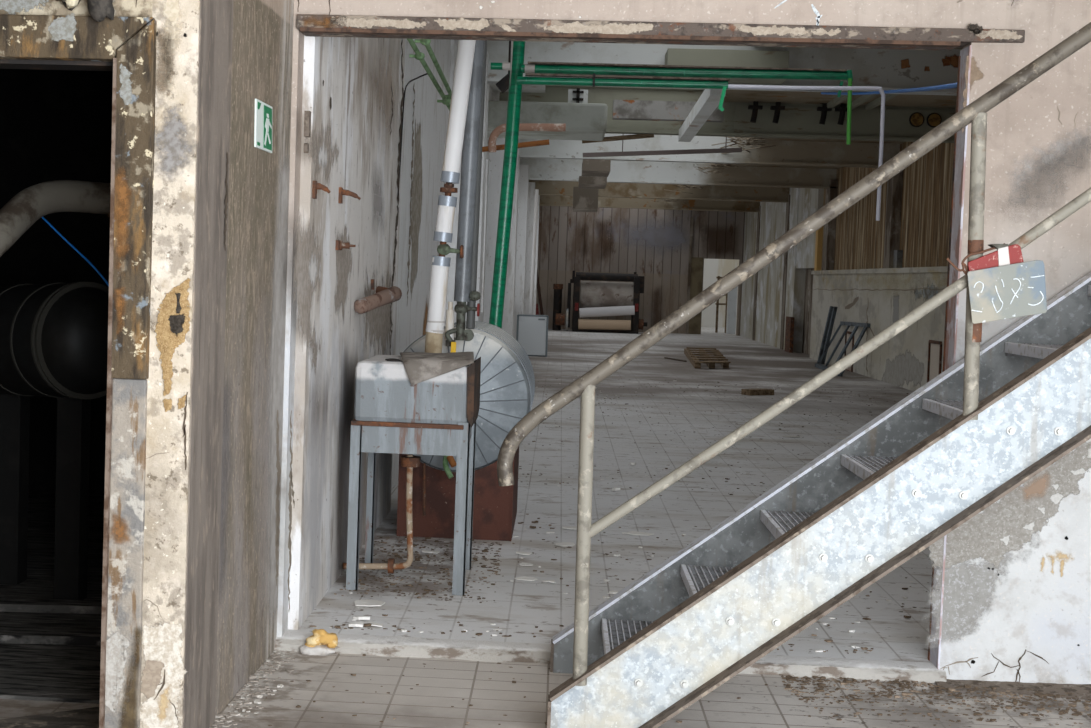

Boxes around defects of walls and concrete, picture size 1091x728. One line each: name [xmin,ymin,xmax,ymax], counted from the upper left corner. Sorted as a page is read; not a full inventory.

corrosion [115,174,131,257]
spalling [155,278,191,470]
peeling [928,439,1091,644]
corrosion [1041,553,1068,577]
crack [940,649,1049,682]